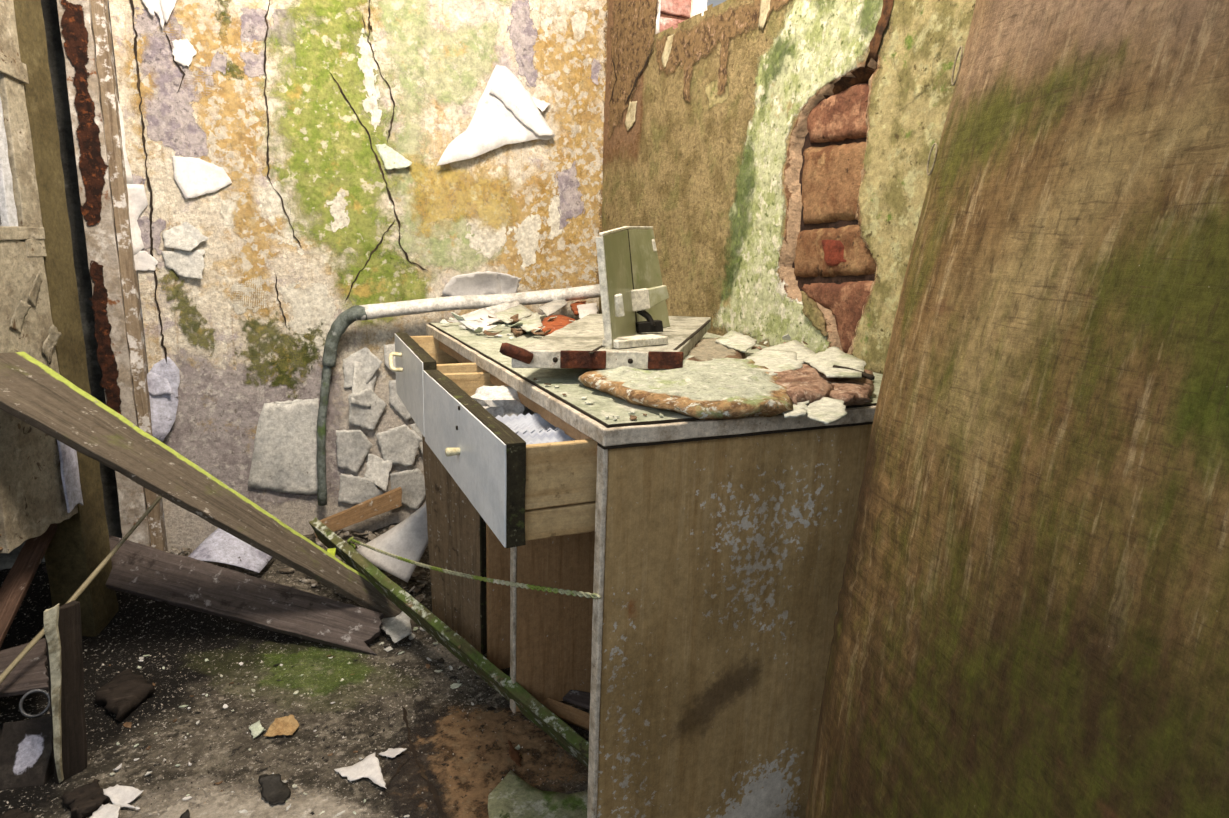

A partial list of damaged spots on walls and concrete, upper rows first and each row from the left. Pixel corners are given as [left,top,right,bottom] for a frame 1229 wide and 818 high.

rust [60,0,108,226]
crack [130,0,185,363]
peeling [118,101,209,279]
crack [264,0,301,246]
crack [330,0,429,301]
peeling [436,0,589,166]
leakage [337,0,789,325]
leakage [761,38,795,112]
flaking render [792,78,877,353]
leakage [859,0,881,35]
rust [89,261,122,415]
peeling [248,398,319,495]